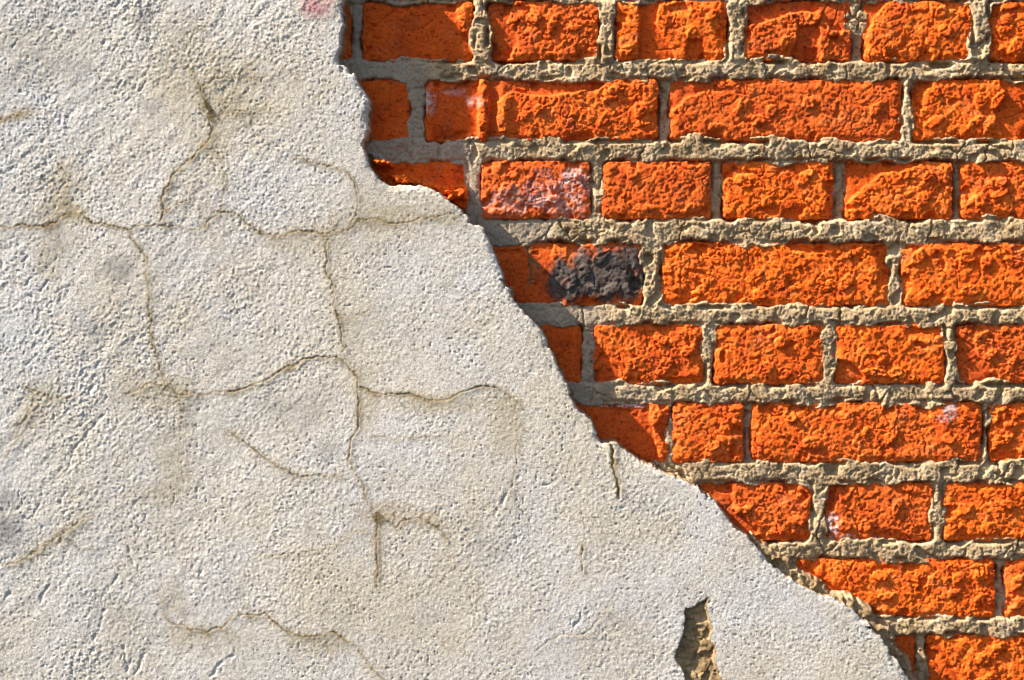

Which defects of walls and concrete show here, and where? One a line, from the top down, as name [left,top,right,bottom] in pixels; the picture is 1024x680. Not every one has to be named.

spalling [742,1,972,63]
spalling [478,79,1023,143]
spalling [481,160,1024,224]
crack [526,247,539,283]
spalling [660,241,1024,307]
crack [1,68,498,583]
spalling [594,323,1024,386]
spalling [648,401,1024,463]
crack [608,443,620,494]
spalling [826,481,1024,542]
spalling [799,556,1024,618]
crack [163,612,362,655]